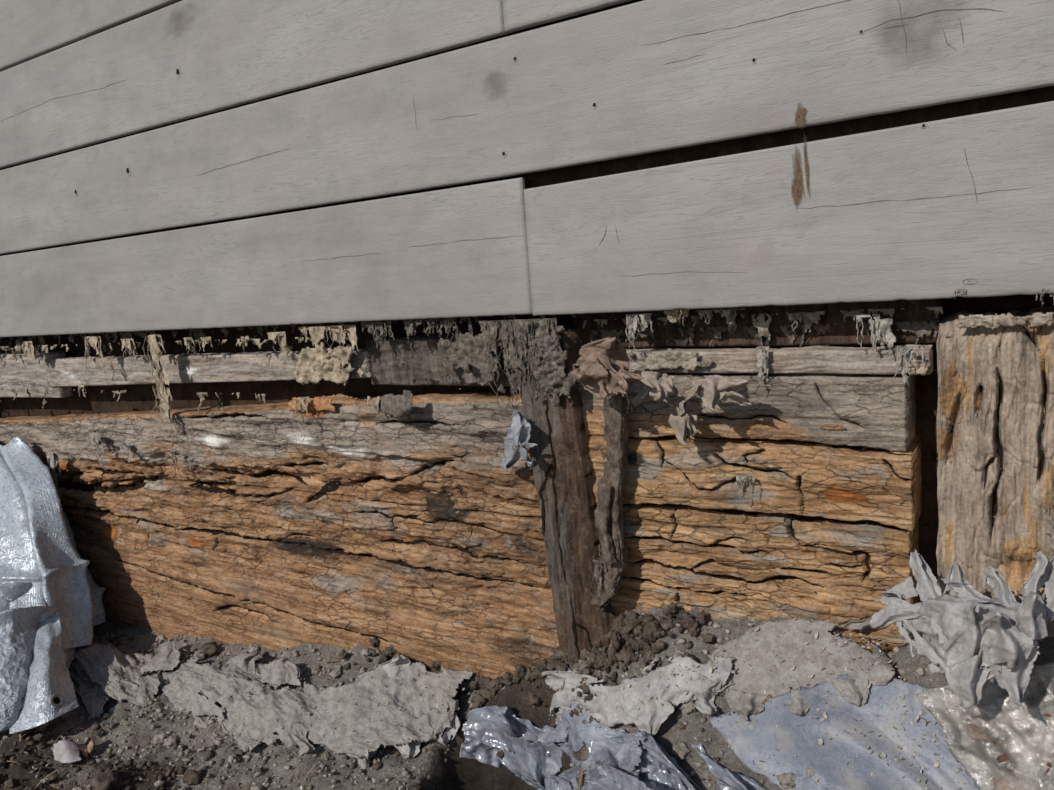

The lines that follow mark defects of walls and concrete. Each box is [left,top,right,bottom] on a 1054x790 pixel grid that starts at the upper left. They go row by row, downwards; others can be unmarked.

crack [642,0,849,64]
crack [860,0,1004,51]
corrosion [795,107,807,127]
crack [805,187,1032,209]
spalling [314,394,357,405]
peeling [379,390,413,418]
crack [622,384,917,600]
crack [54,400,593,663]